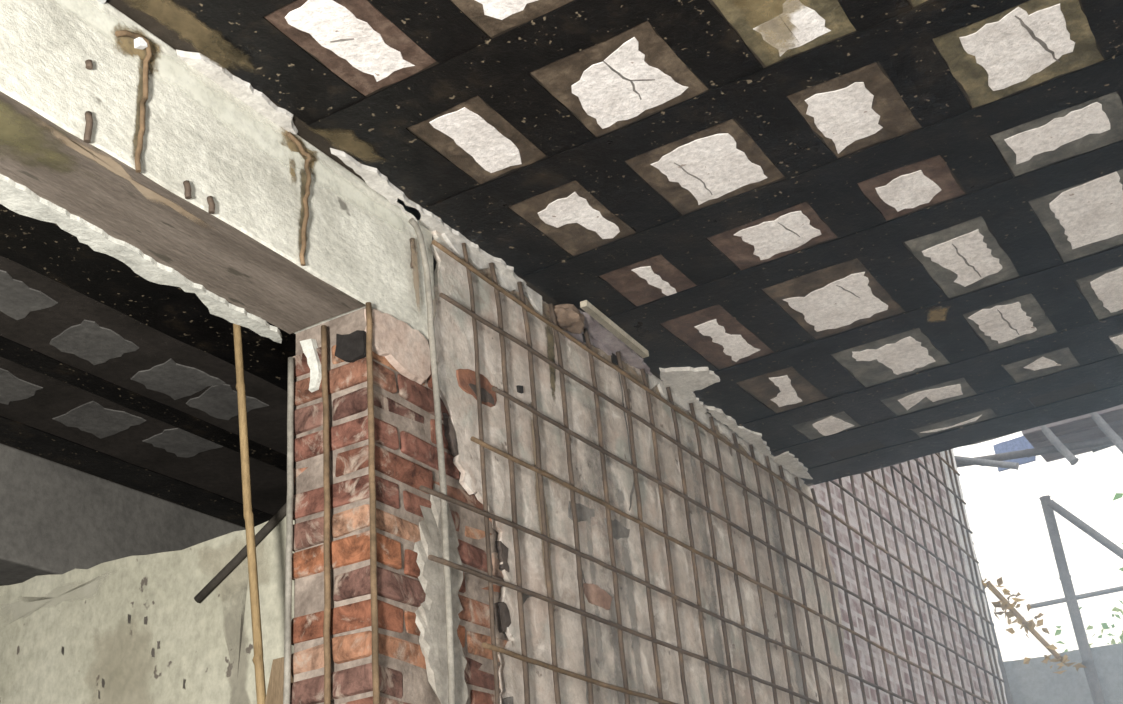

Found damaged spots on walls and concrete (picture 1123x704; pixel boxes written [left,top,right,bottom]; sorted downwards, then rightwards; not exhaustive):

corrosion [115,25,160,173]
crack [603,61,655,100]
crack [1014,16,1061,62]
corrosion [282,130,317,266]
crack [674,163,712,195]
crack [952,244,981,277]
peeling [963,293,1057,351]
spalling [330,148,1020,704]
spalling [283,357,294,704]
spalling [321,302,380,704]